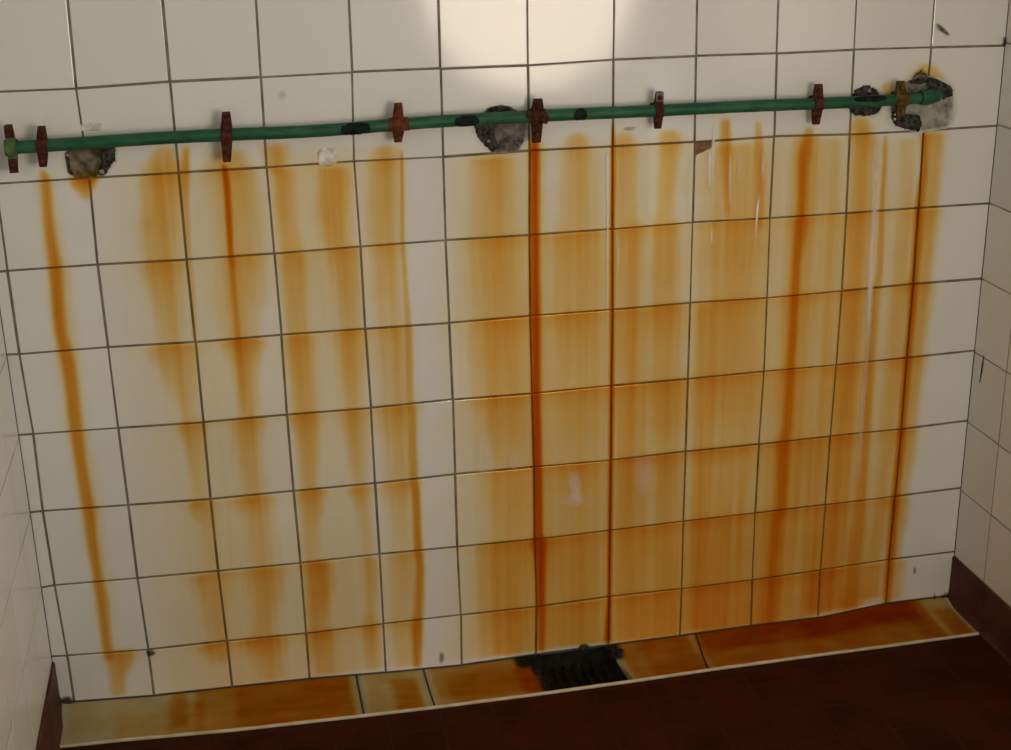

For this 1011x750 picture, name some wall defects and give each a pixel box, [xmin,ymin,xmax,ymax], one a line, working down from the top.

spalling [454,105,527,154]
spalling [849,76,954,133]
spalling [65,147,116,181]
rust [534,241,544,607]